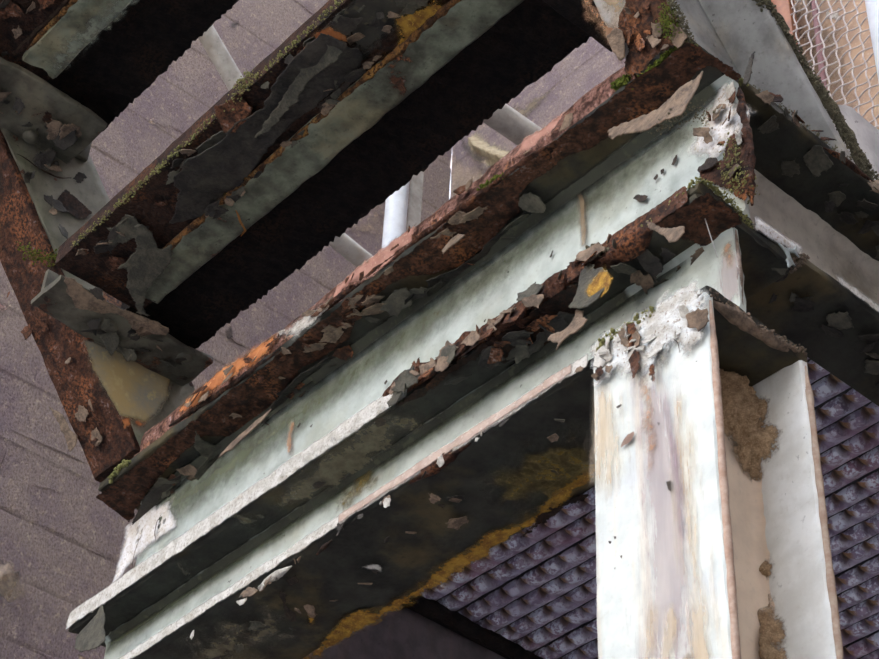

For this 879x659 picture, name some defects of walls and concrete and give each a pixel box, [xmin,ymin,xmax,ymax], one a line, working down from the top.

peeling [607,14,688,61]
peeling [154,5,382,224]
spalling [462,114,563,166]
peeling [607,71,703,140]
rust [57,189,92,219]
peeling [334,226,414,297]
rust [96,0,751,522]
peeling [357,192,546,323]
peeling [64,214,173,422]
peeling [49,399,102,452]
leakage [496,392,614,500]
leakage [338,473,377,506]